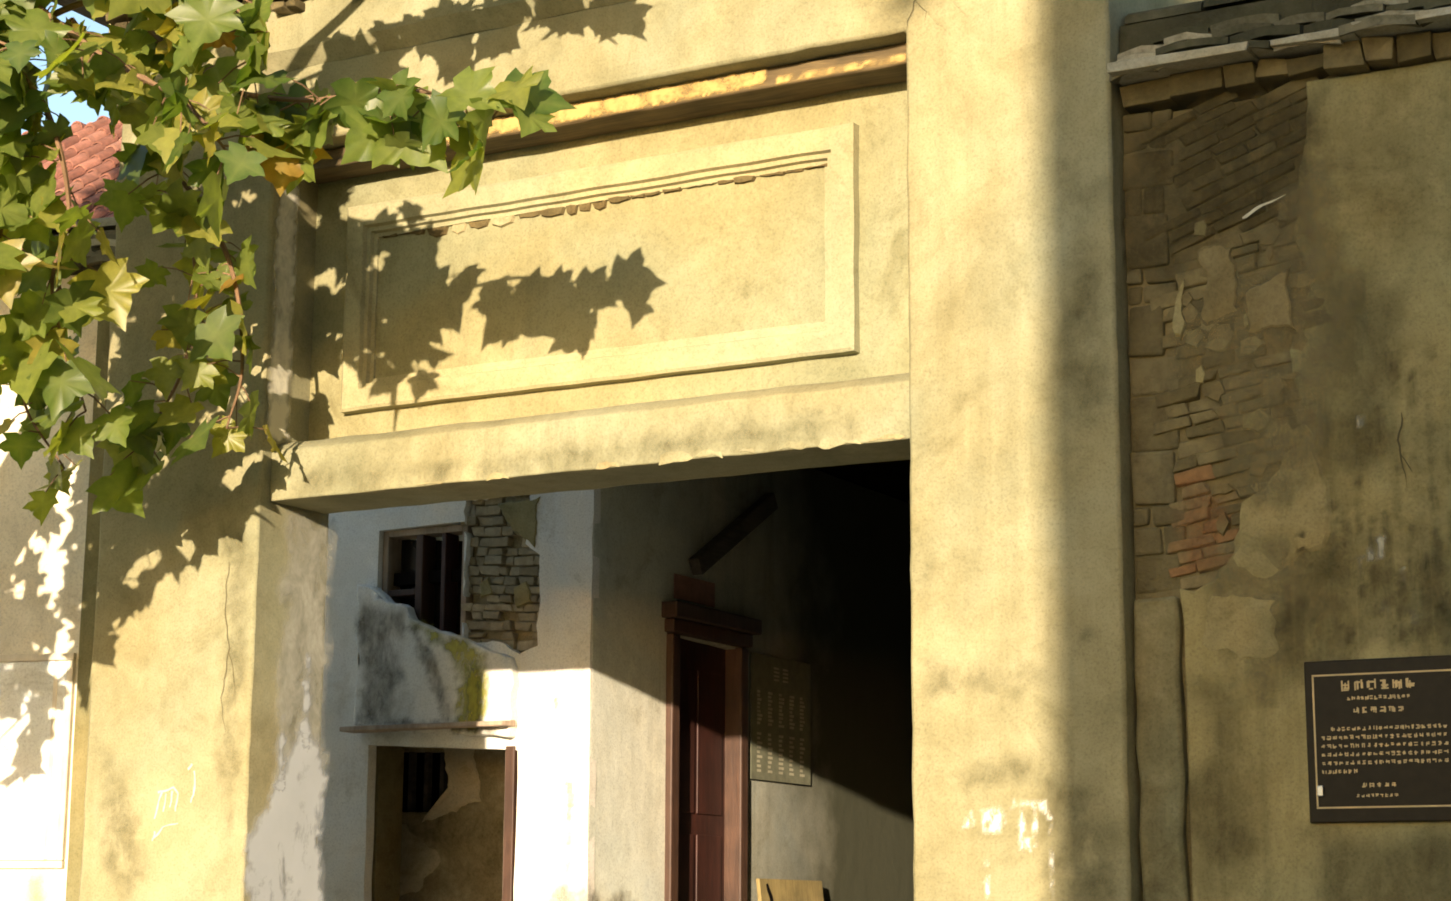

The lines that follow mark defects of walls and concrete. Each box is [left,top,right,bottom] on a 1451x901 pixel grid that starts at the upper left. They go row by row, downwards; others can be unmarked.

flaking render [1138,75,1339,660]
spalling [778,433,905,450]
spalling [487,472,508,481]
spalling [596,461,620,470]
spalling [659,448,755,465]
leakage [1368,537,1384,559]
flaking render [460,496,541,653]
leakage [452,666,492,732]
peeling [400,748,481,896]